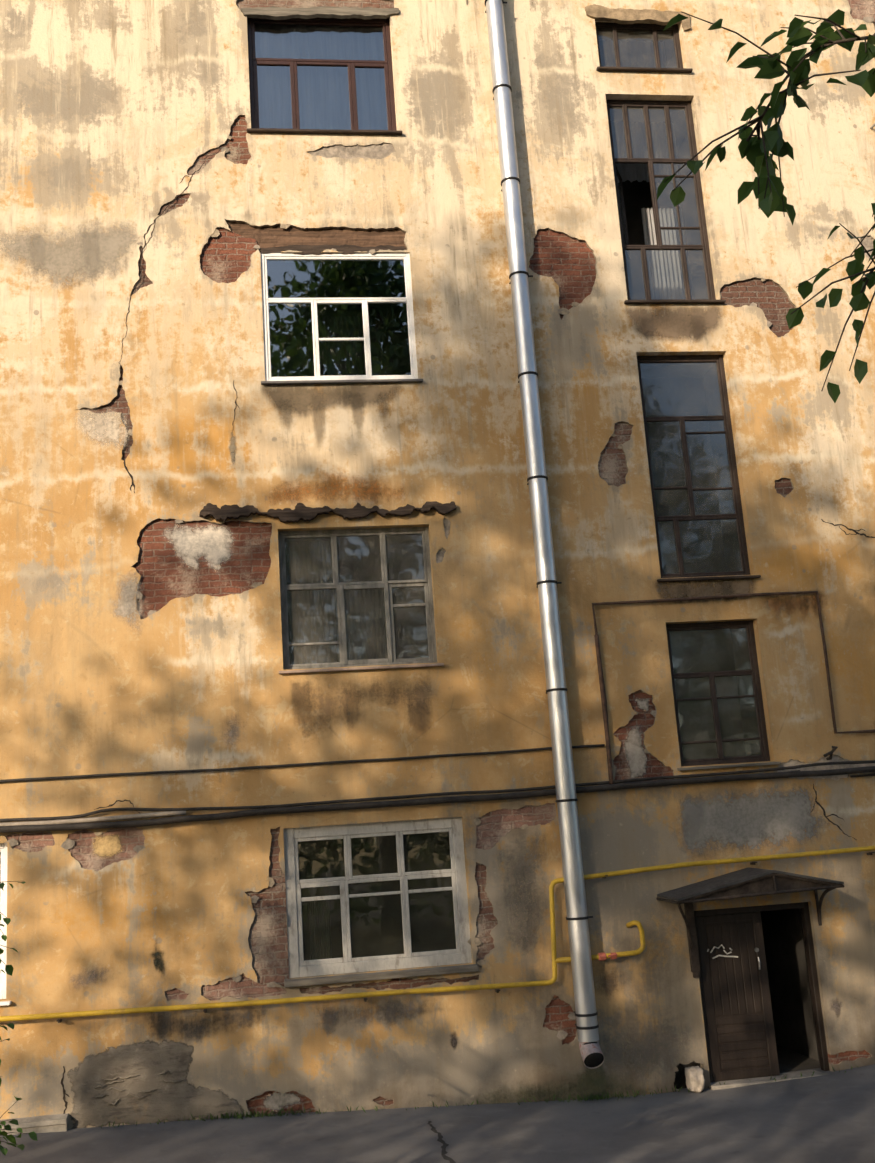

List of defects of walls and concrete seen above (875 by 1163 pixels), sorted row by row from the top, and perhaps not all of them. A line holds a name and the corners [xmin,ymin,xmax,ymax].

crack [119,145,226,370]
flaking render [200,229,260,283]
flaking render [529,229,596,320]
flaking render [720,278,794,337]
crack [123,459,135,493]
flaking render [598,422,633,487]
flaking render [115,519,272,621]
flaking render [613,690,673,782]
flaking render [4,827,145,872]
peeling [681,755,875,853]
crack [811,784,856,840]
flaking render [164,803,556,1001]